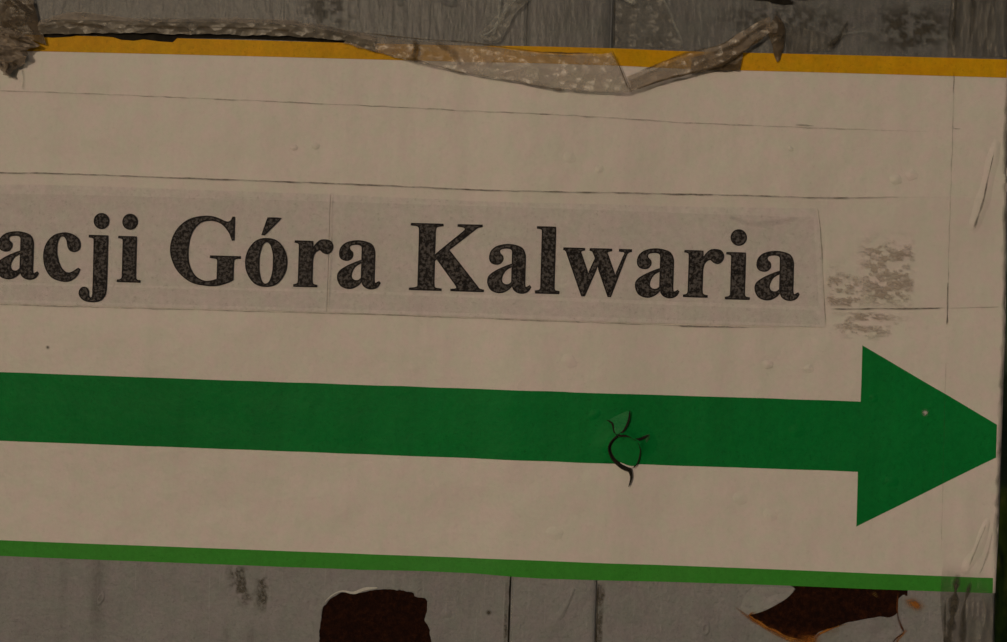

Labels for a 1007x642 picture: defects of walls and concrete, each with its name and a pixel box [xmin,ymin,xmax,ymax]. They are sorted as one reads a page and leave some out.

rust [305,574,446,642]
rust [736,585,922,642]